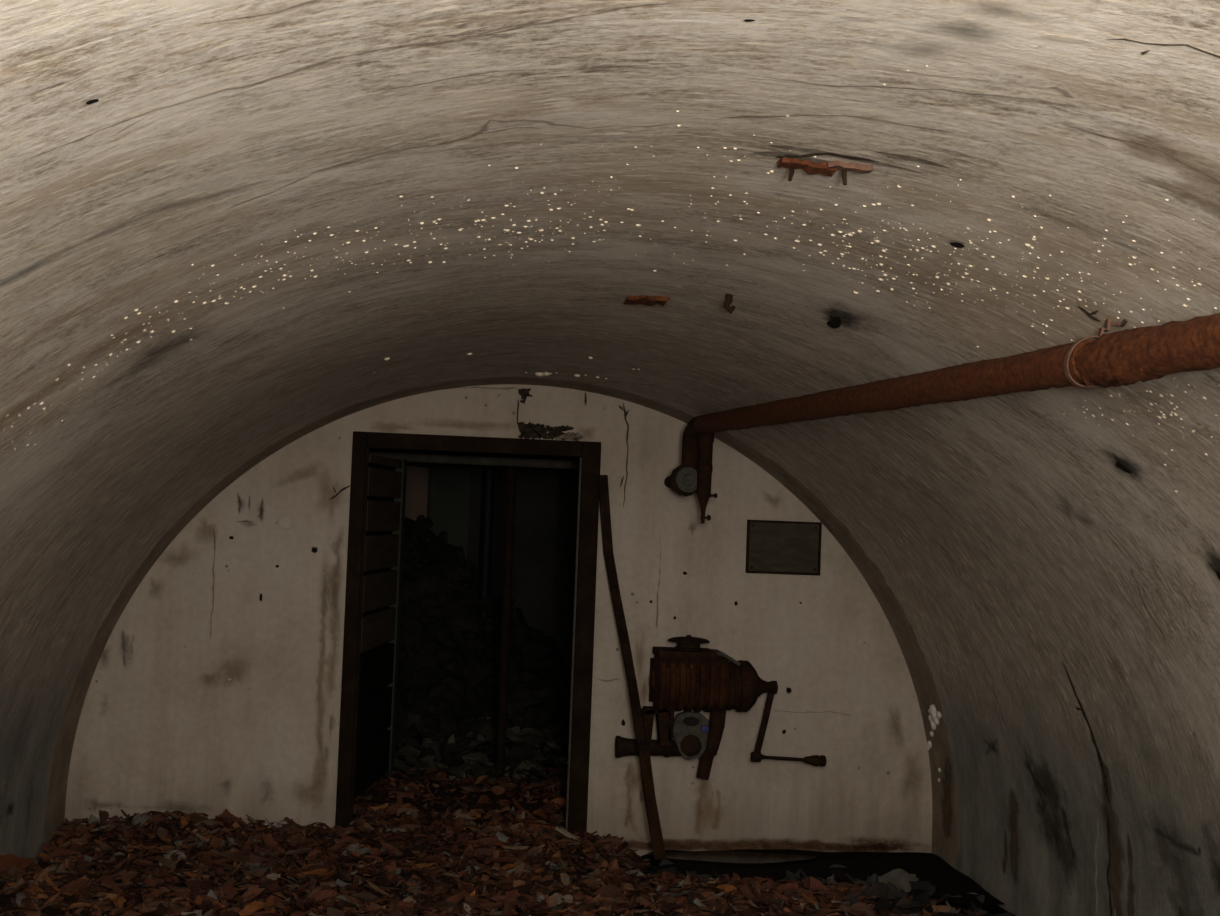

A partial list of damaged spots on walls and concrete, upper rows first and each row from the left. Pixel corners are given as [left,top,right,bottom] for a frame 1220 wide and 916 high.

crack [1107,38,1220,58]
damp [318,538,341,742]
damp [927,704,942,750]
crack [1062,662,1112,916]